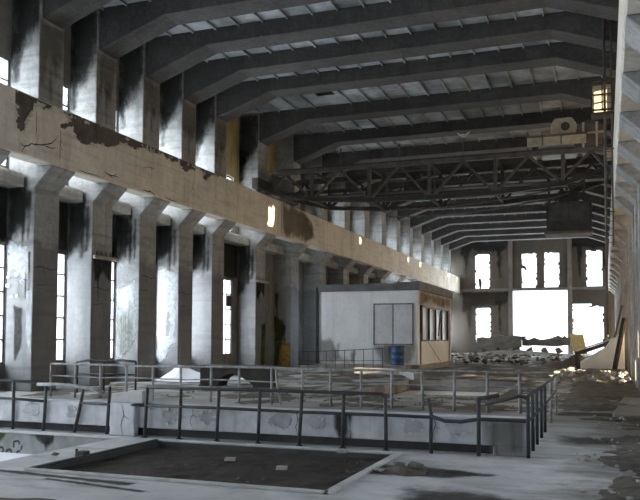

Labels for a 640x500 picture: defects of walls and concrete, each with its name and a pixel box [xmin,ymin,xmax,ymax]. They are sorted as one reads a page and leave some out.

water stain [12,49,20,81]
spalling [15,90,53,131]
water stain [70,77,79,111]
crack [20,113,63,159]
spalling [61,112,219,181]
water stain [80,193,90,258]
water stain [283,206,314,241]